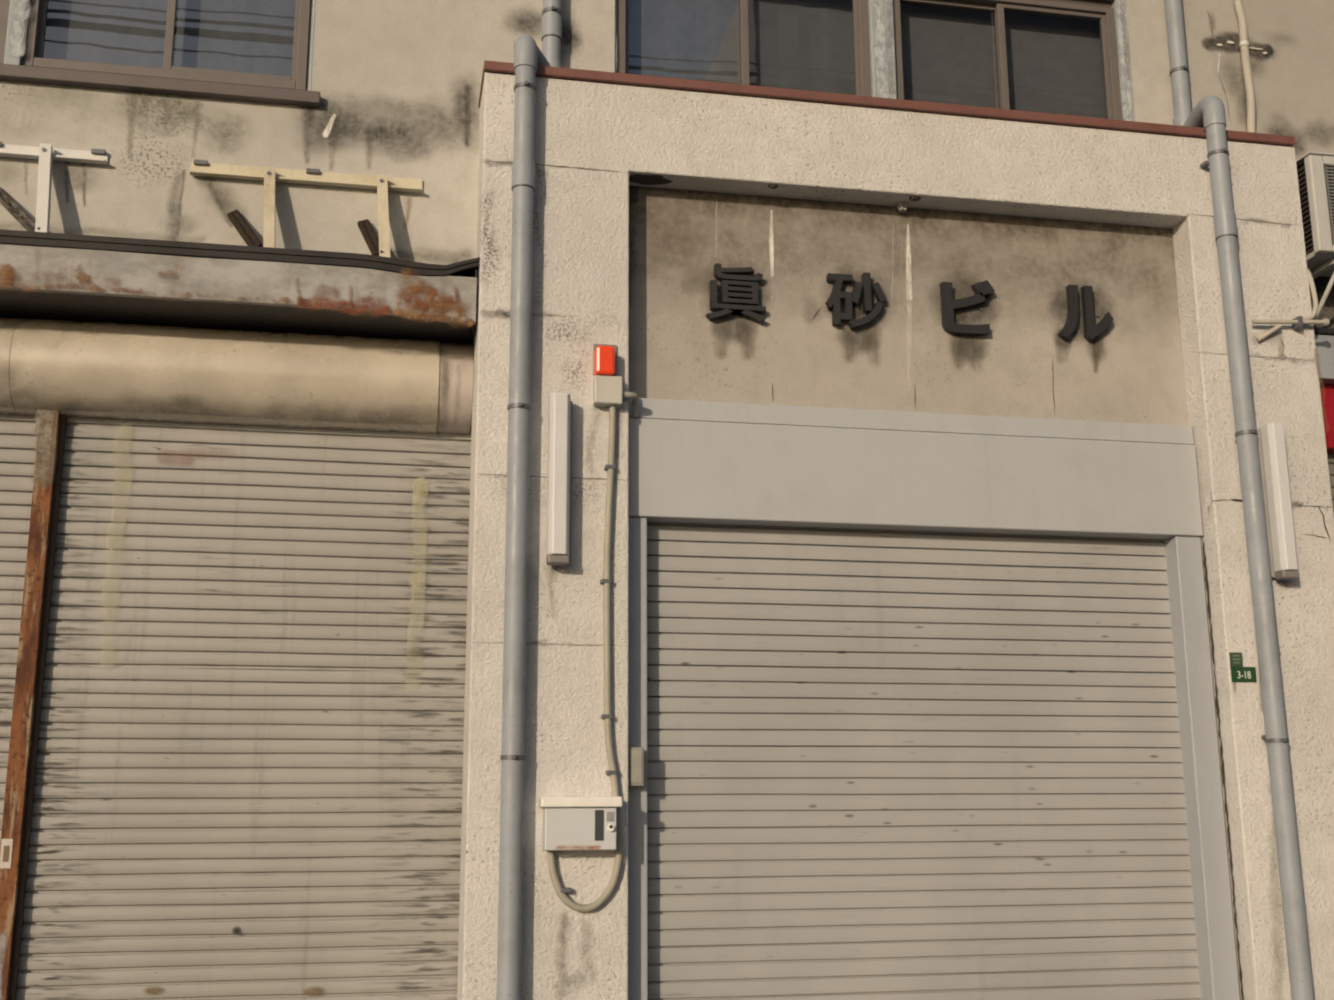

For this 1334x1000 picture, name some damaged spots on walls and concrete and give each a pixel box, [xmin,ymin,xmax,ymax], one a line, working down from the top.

water stain [308,107,405,142]
corrosion [0,265,58,290]
water stain [892,224,913,315]
corrosion [273,271,474,327]
crack [1295,503,1334,541]